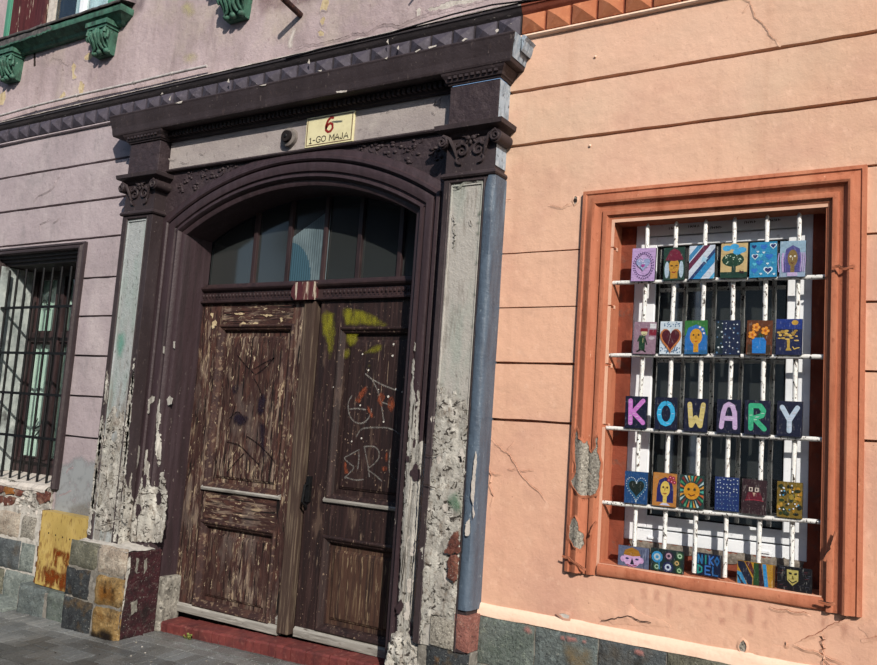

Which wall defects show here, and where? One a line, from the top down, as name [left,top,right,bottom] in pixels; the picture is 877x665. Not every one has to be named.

crack [742,0,781,47]
spalling [87,354,173,544]
spalling [395,342,477,642]
crack [488,438,547,507]
spalling [569,426,603,499]
rust [44,548,69,588]
crack [823,531,837,562]
crack [784,600,849,665]